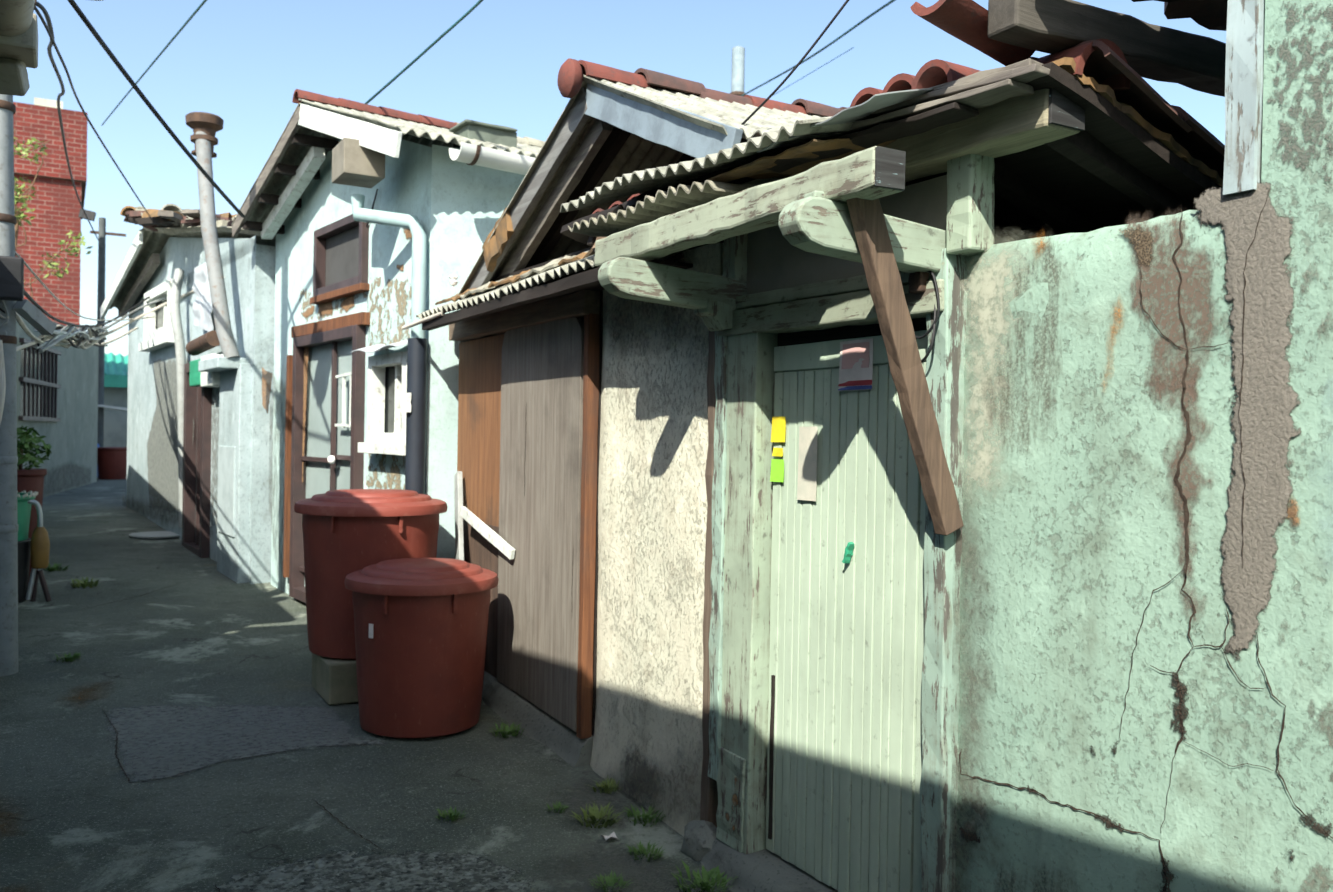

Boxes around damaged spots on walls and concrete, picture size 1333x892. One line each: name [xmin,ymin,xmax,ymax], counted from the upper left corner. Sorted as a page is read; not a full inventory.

peeling [299,265,412,351]
crack [959,189,1333,886]
water stain [1128,215,1214,569]
spalling [1287,498,1300,525]